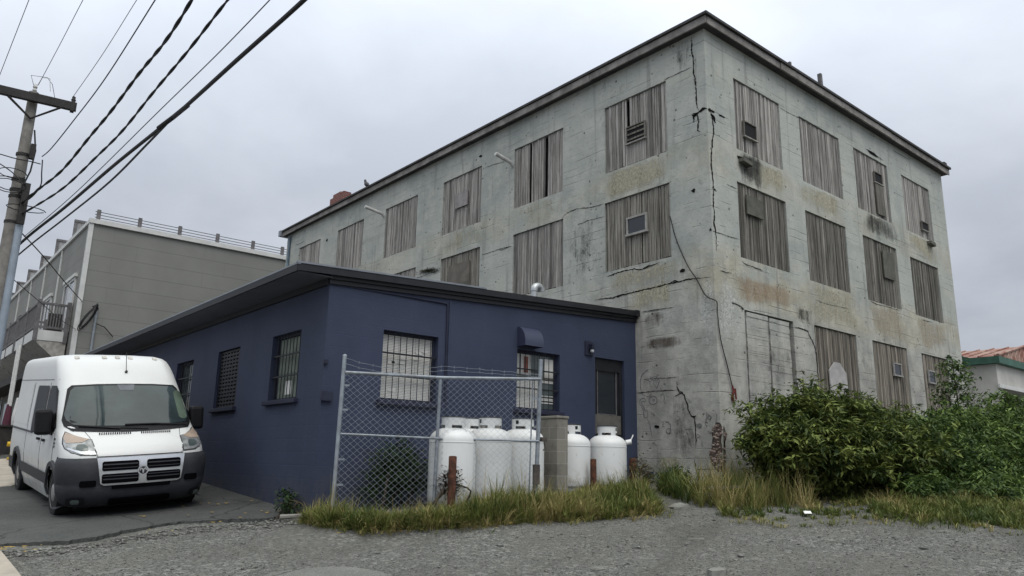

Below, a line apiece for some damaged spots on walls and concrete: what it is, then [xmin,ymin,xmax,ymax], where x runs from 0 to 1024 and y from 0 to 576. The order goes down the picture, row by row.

crack [598,40,762,312]
crack [638,377,715,470]
spalling [709,422,727,475]